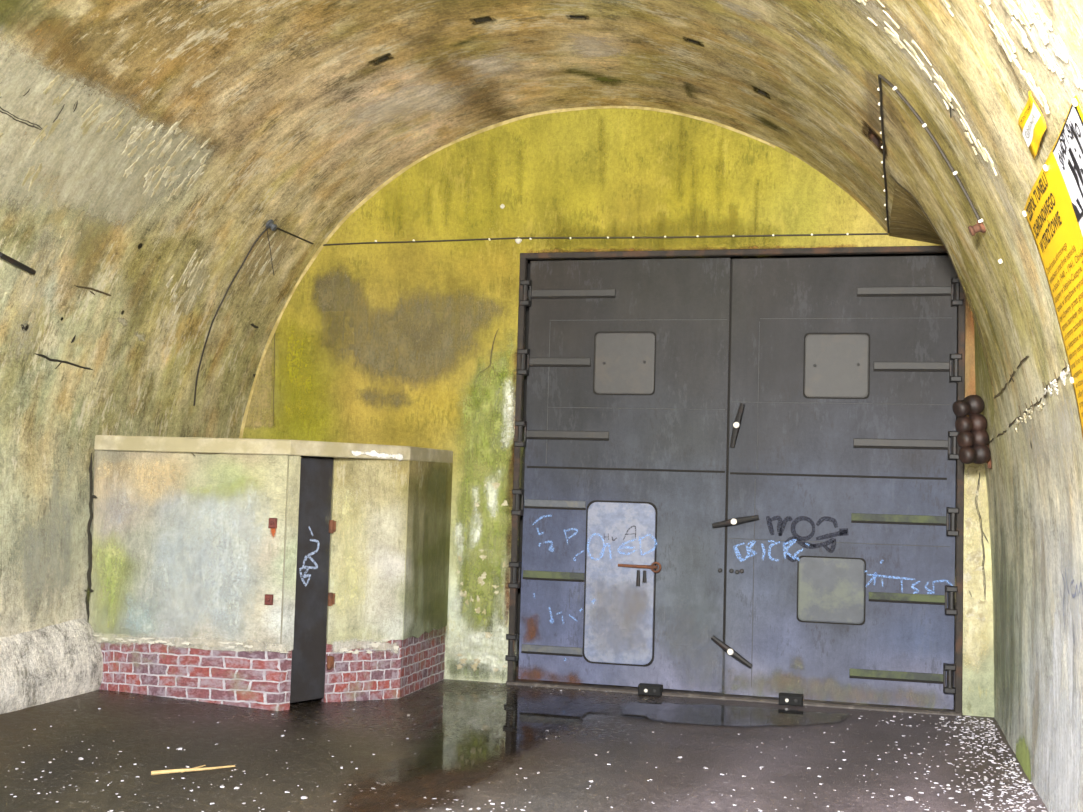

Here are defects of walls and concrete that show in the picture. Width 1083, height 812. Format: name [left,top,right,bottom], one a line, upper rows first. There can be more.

crack [0,89,78,130]
crack [21,324,93,370]
damp [313,269,501,384]
crack [988,356,1070,444]
damp [461,368,482,570]
damp [492,361,510,545]
rust [526,618,538,640]